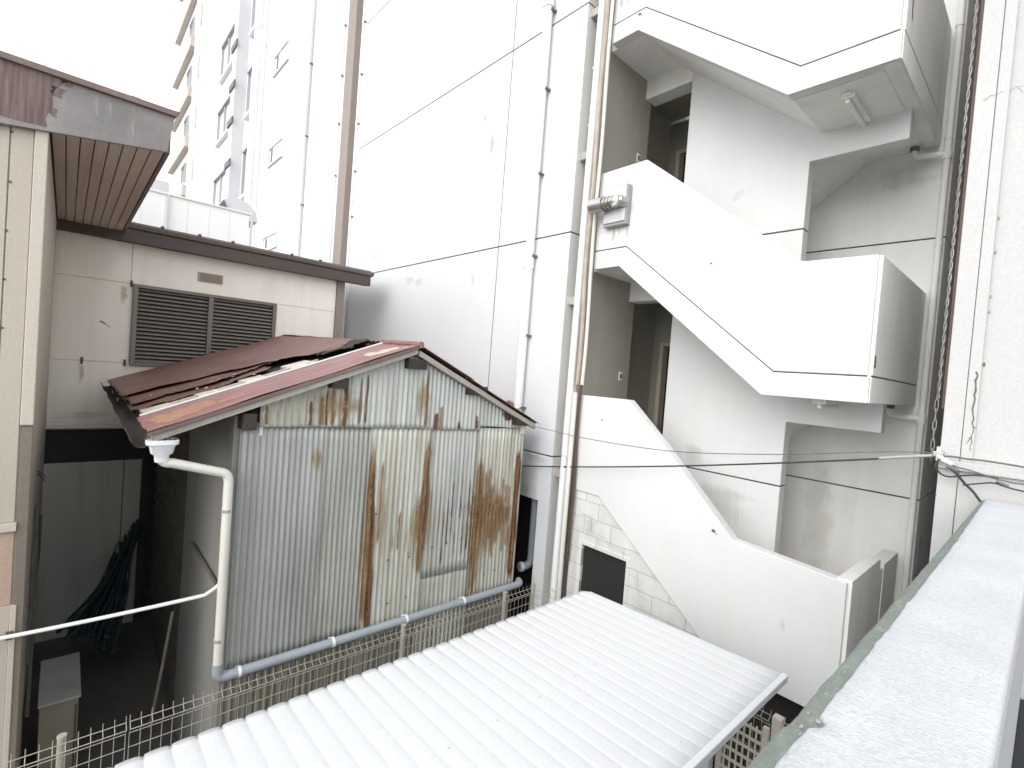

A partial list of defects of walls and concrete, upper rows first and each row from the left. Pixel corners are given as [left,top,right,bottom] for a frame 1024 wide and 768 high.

rust [148,392,246,424]
rust [308,375,369,427]
crack [966,371,979,451]
rust [360,443,521,627]